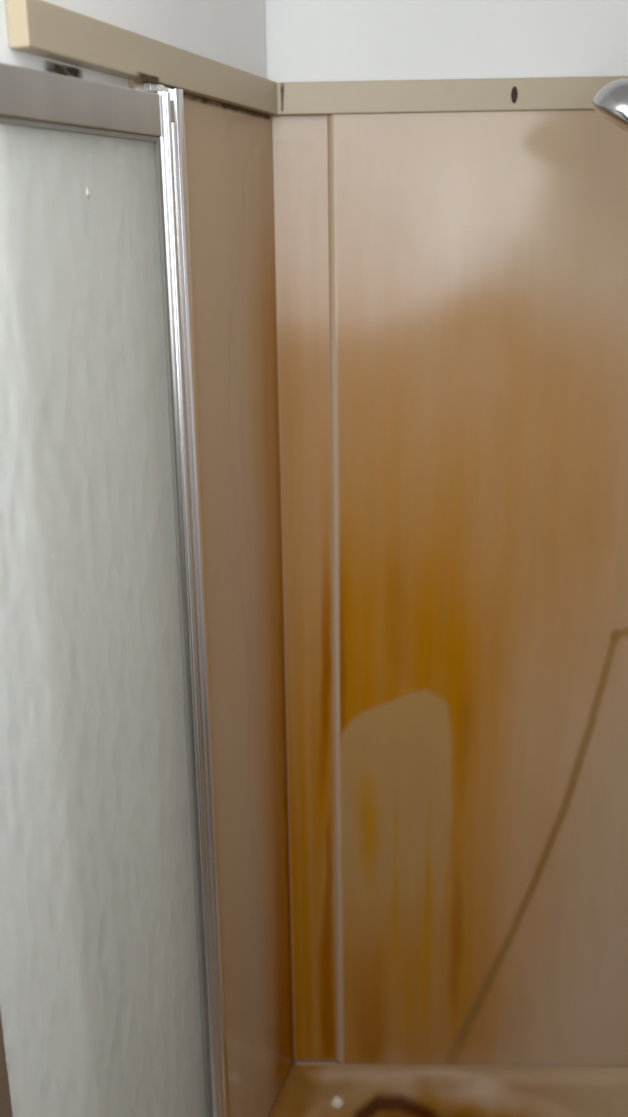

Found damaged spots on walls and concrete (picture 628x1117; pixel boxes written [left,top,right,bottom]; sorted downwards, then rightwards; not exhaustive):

peeling [338,685,456,1053]
rust [229,122,628,1117]